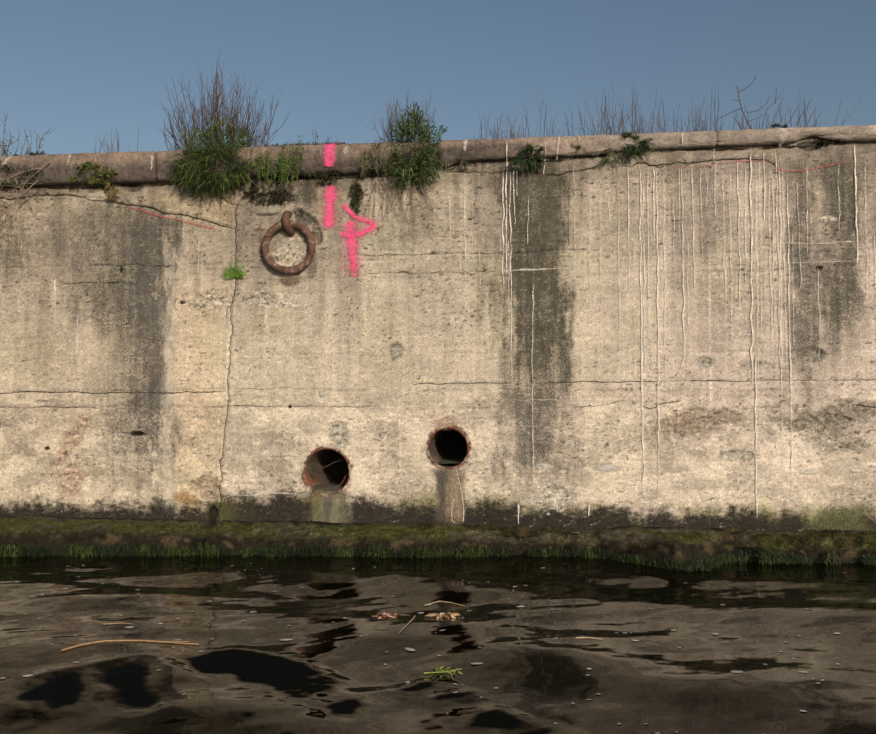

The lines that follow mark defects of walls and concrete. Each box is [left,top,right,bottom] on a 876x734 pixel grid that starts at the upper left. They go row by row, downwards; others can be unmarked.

crack [0,181,364,519]
crack [270,172,419,181]
damp [0,137,876,534]
crack [367,143,809,274]